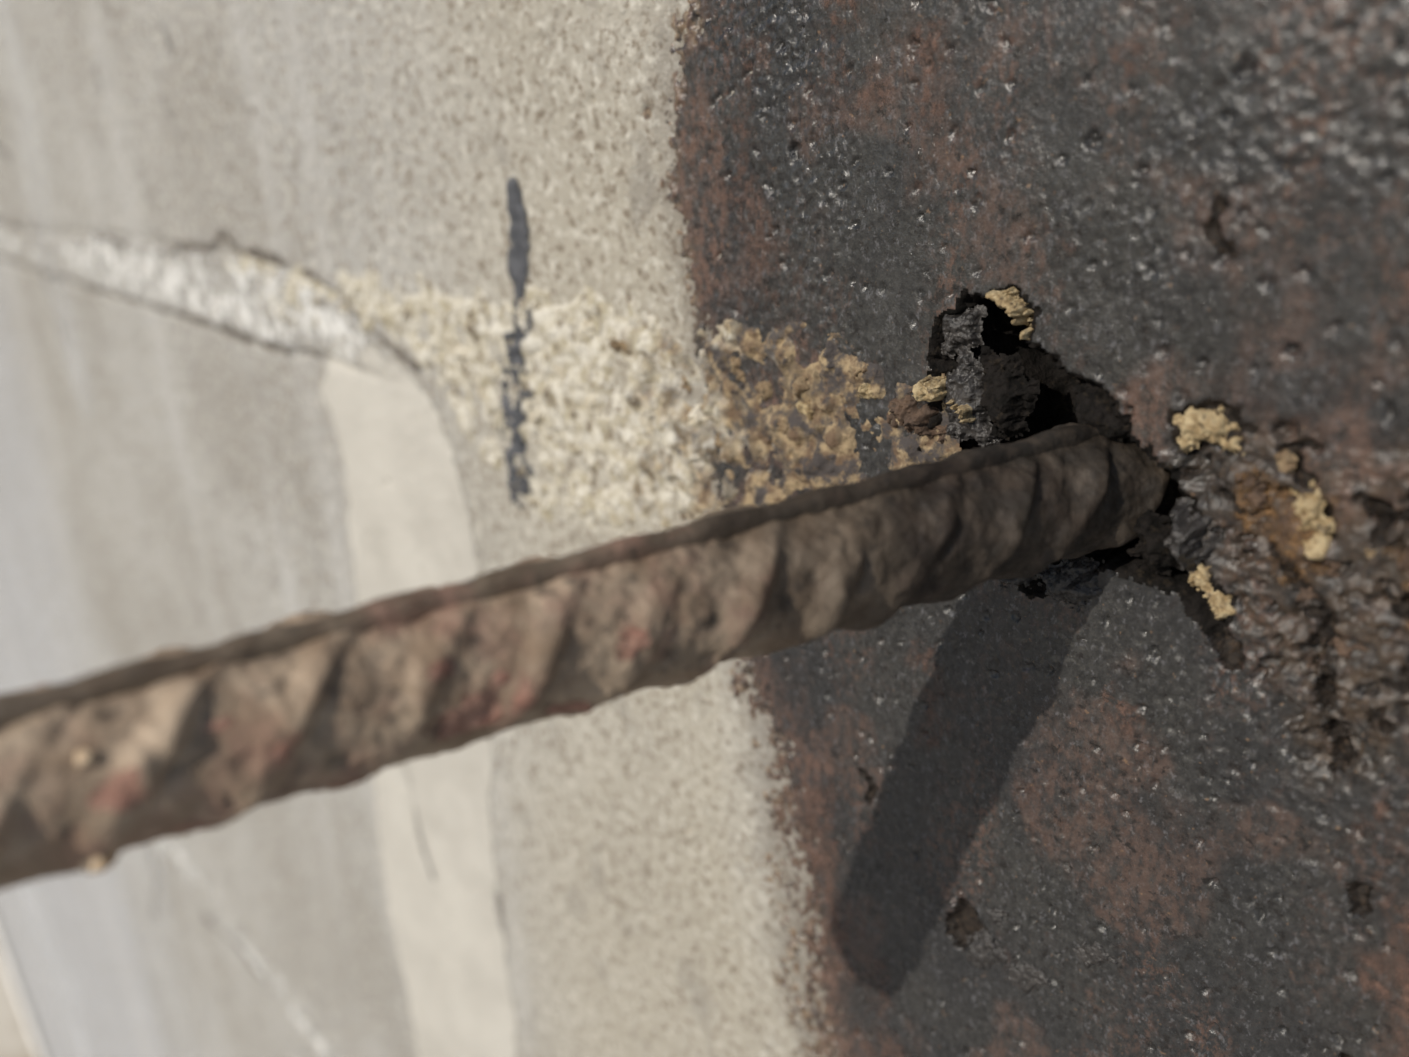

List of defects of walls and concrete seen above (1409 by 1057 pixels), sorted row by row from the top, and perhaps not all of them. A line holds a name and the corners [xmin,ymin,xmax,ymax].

spalling [225,253,1258,671]
rust [1234,469,1328,585]
spalling [1352,491,1409,550]
spalling [1269,437,1395,772]
spalling [1361,565,1409,620]
rust [617,626,651,660]
spalling [1380,654,1409,695]
rust [543,701,595,715]
rust [87,767,146,813]
spalling [858,768,878,806]
rust [159,822,218,837]
spalling [1346,881,1373,919]